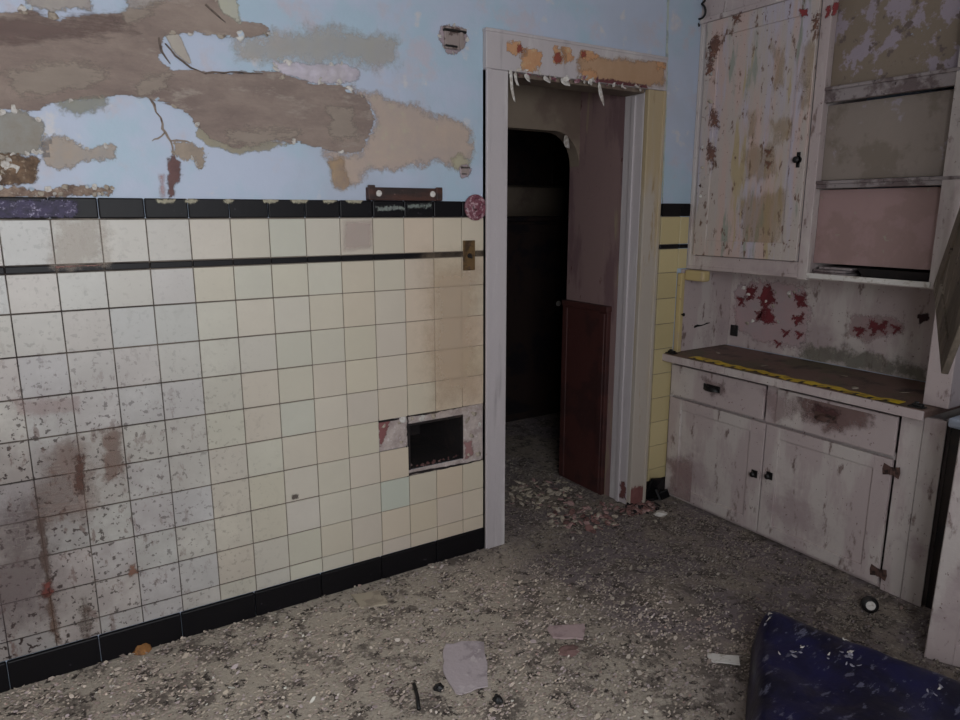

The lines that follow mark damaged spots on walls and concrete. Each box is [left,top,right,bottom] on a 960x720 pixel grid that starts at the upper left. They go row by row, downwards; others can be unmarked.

peeling [799,2,840,32]
crack [149,99,191,157]
peeling [0,0,376,198]
peeling [507,40,666,105]
peeling [698,99,721,198]
peeling [705,33,723,81]
peeling [734,278,812,348]
peeling [849,315,904,342]
spalling [378,403,483,475]
spalling [619,478,670,504]
water stain [36,517,51,582]